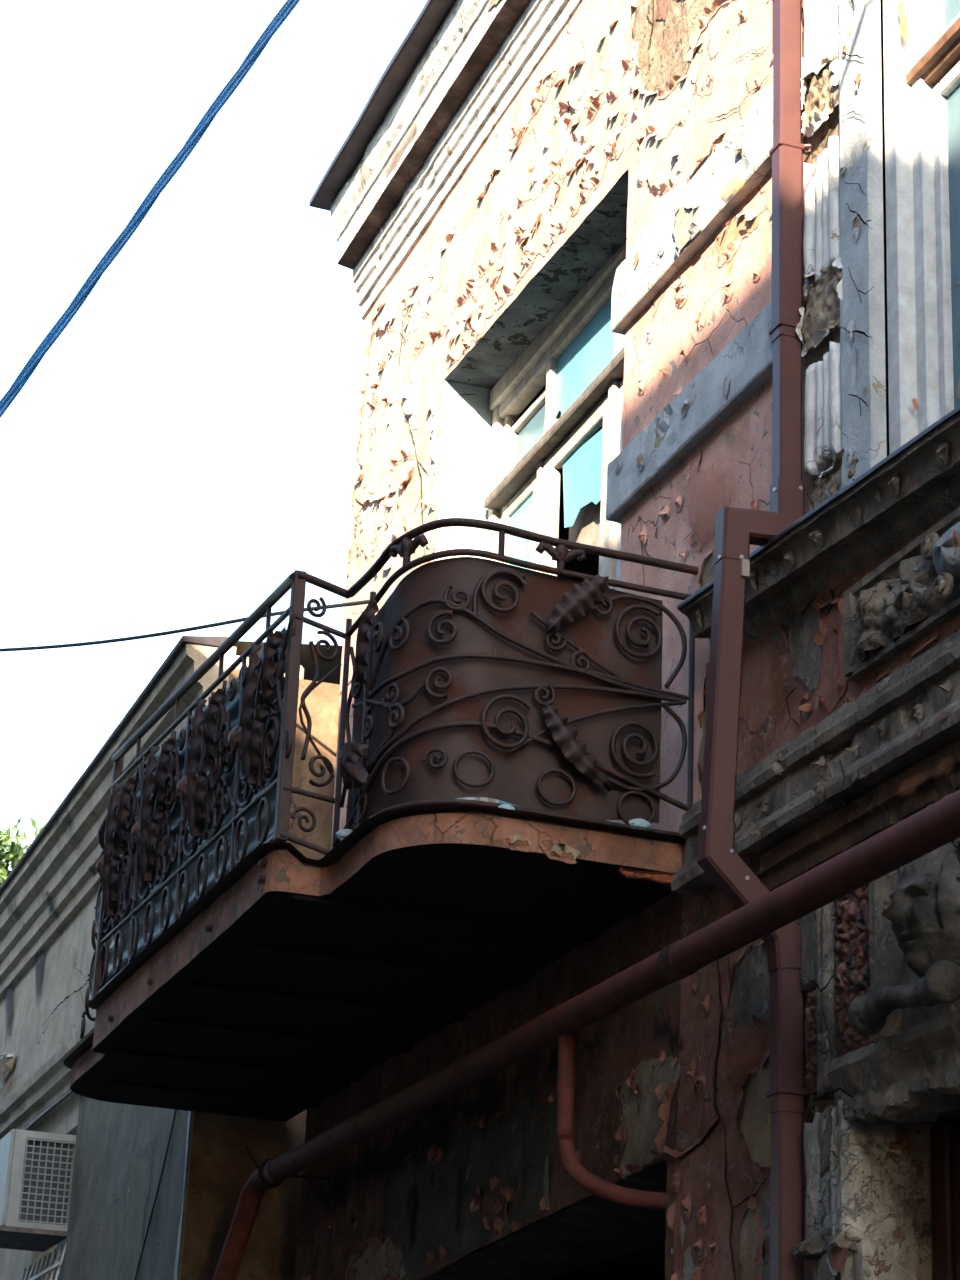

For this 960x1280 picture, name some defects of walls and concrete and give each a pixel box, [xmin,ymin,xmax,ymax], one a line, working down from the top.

crack [646,0,654,69]
crack [705,47,770,122]
flaking render [800,41,861,137]
peeling [344,0,749,615]
flaking render [716,208,759,302]
flaking render [796,257,854,357]
crack [400,402,429,556]
flaking render [781,592,960,724]
peeling [596,1050,707,1179]
peeling [667,1168,718,1280]
crack [663,957,771,1280]
peeling [735,1051,771,1280]